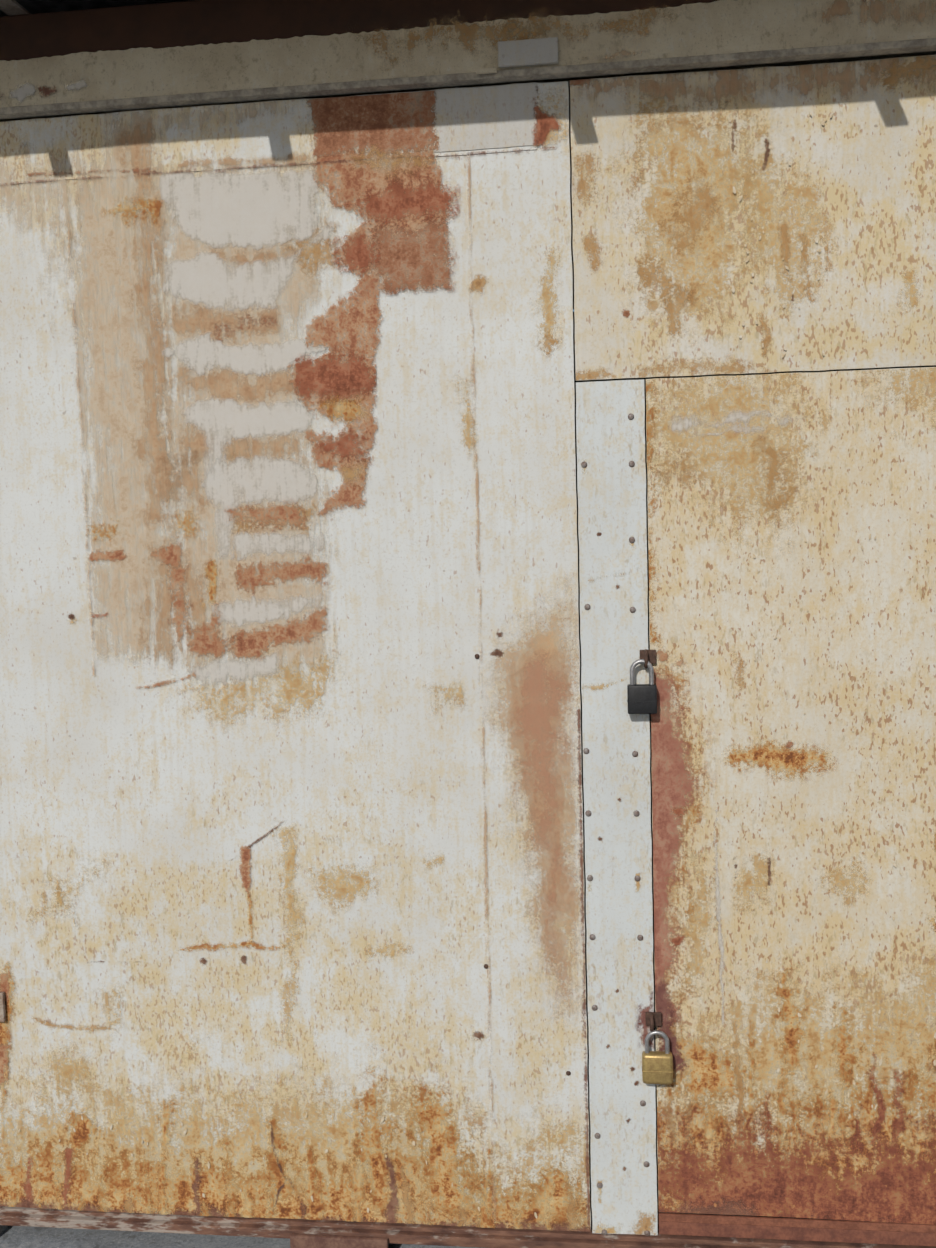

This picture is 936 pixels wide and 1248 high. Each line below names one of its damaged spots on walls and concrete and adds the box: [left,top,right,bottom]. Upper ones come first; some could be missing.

corrosion [164,91,459,531]
corrosion [470,275,486,292]
corrosion [540,250,558,354]
corrosion [533,96,567,146]
corrosion [633,98,762,334]
corrosion [88,524,126,562]
corrosion [150,511,327,659]
corrosion [639,360,826,519]
corrosion [180,828,376,1035]
corrosion [490,606,581,1000]
corrosion [634,533,936,1235]
corrosion [0,963,616,1234]